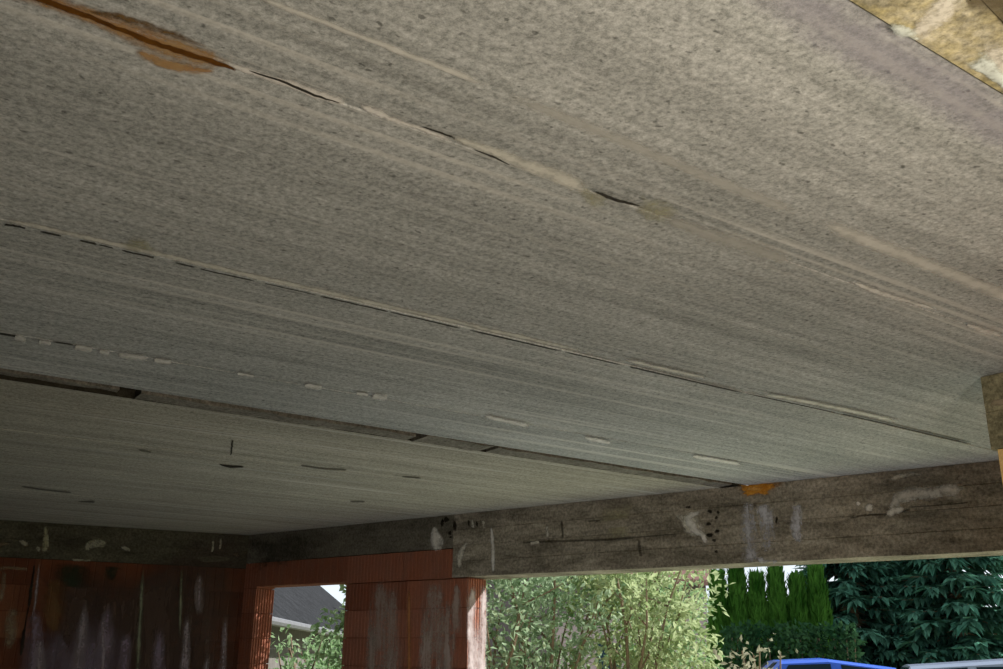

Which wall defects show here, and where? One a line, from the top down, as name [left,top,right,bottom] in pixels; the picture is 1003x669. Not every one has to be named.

rust [36,0,235,73]
damp [892,0,1003,39]
crack [4,220,968,444]